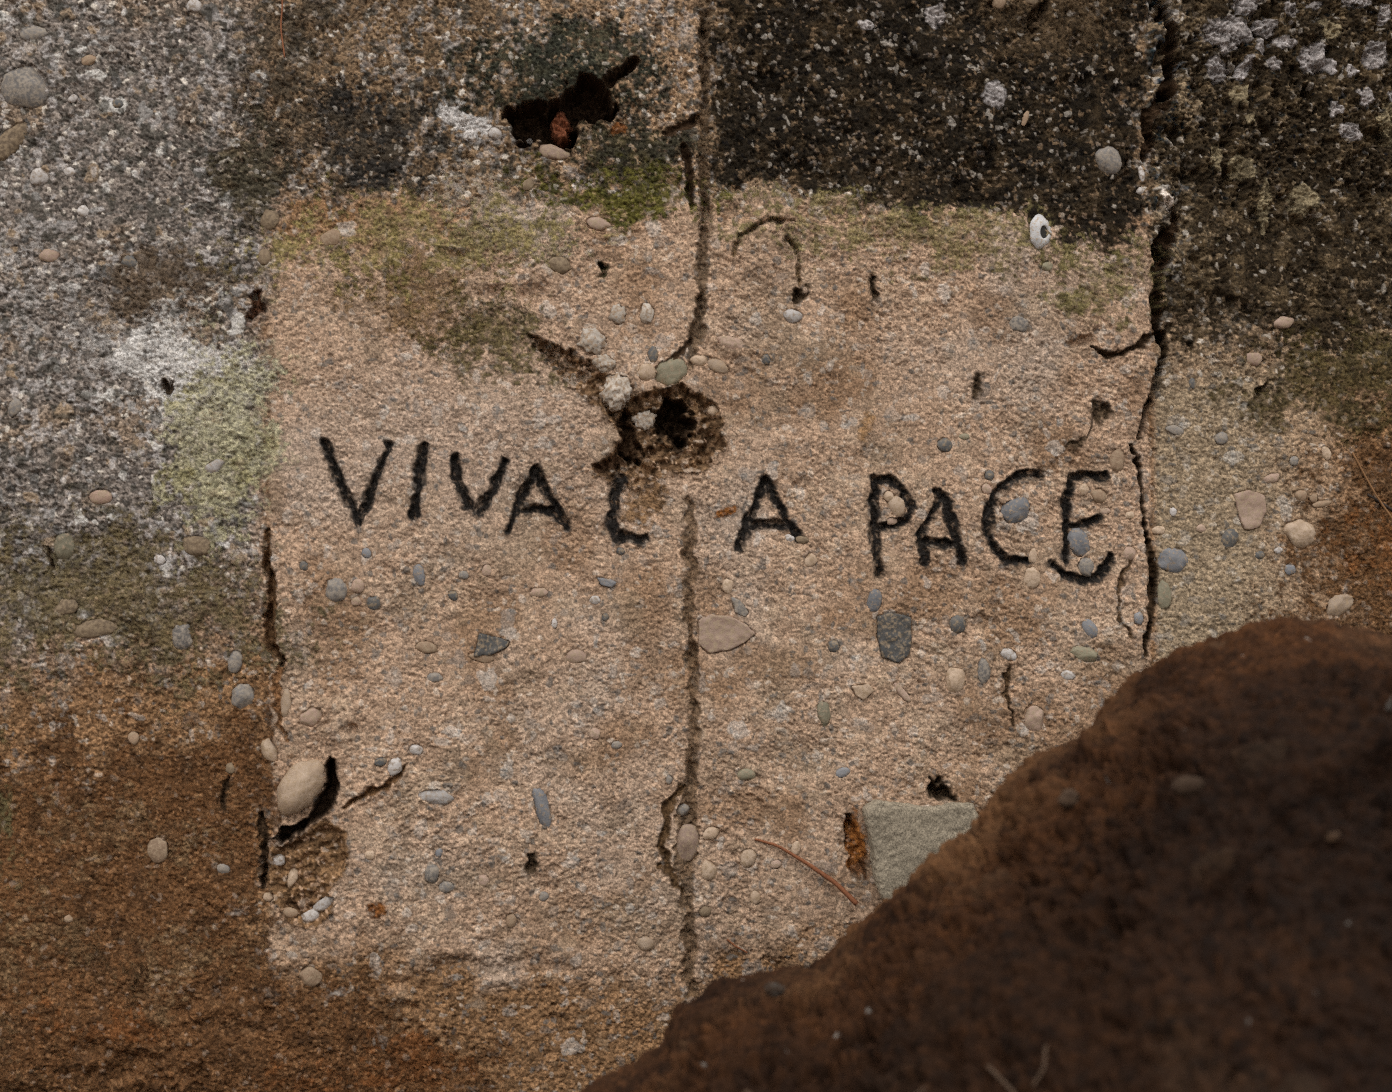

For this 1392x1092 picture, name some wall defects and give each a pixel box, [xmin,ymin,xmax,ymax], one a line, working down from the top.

spalling [501,55,641,157]
crack [661,0,712,368]
leakage [205,0,1392,358]
crack [1090,206,1178,371]
crack [1139,7,1178,162]
spalling [532,336,727,529]
crack [262,528,289,742]
crack [1116,436,1158,657]
spalling [267,756,405,929]
crack [656,497,701,998]